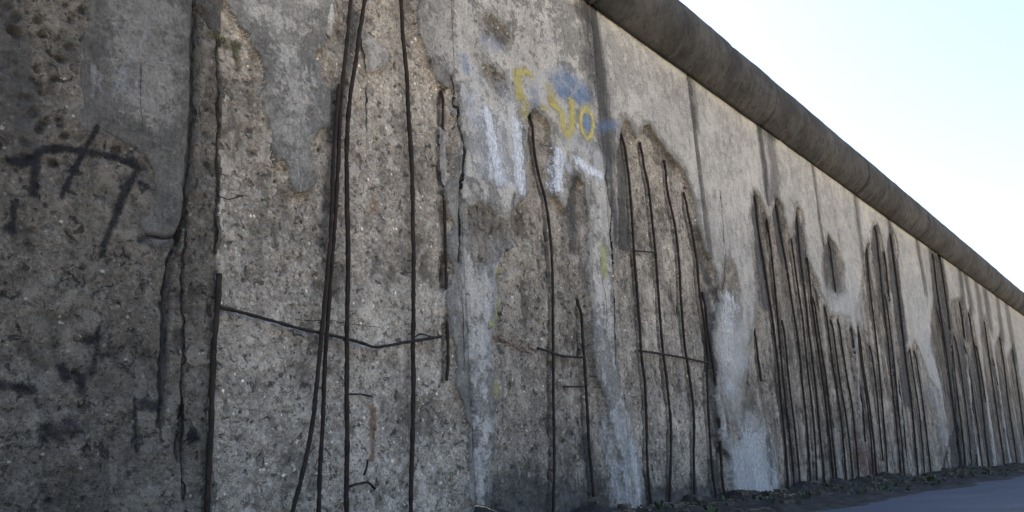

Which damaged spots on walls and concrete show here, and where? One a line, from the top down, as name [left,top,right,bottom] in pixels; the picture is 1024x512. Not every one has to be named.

crack [138,0,246,499]
spalling [0,0,472,512]
leakage [487,79,787,512]
spalling [466,102,1024,512]